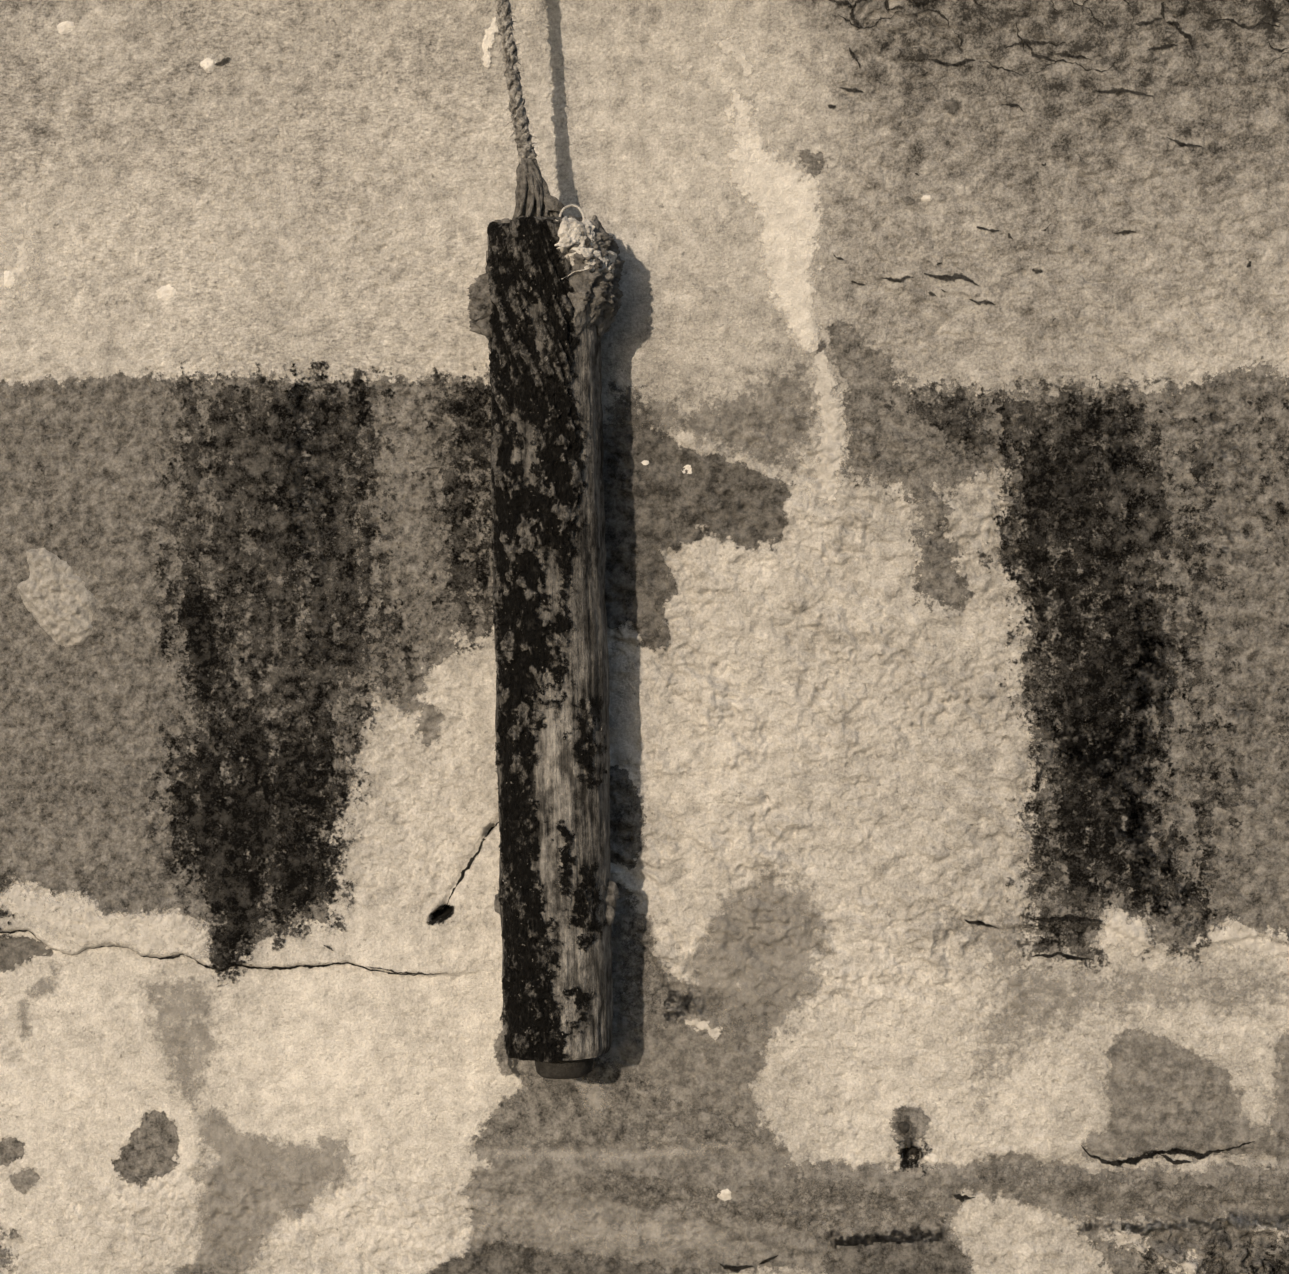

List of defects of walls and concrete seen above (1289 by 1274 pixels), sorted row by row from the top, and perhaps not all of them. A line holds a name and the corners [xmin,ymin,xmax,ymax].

leakage [715,32,753,78]
crack [828,0,1289,112]
crack [833,254,996,305]
crack [977,226,1013,239]
leakage [603,89,1289,1090]
leakage [0,368,494,981]
crack [426,822,499,925]
leakage [20,970,54,1037]
leakage [148,972,213,1097]
crack [0,930,441,976]
leakage [429,865,1289,1274]
crack [1081,1141,1255,1167]